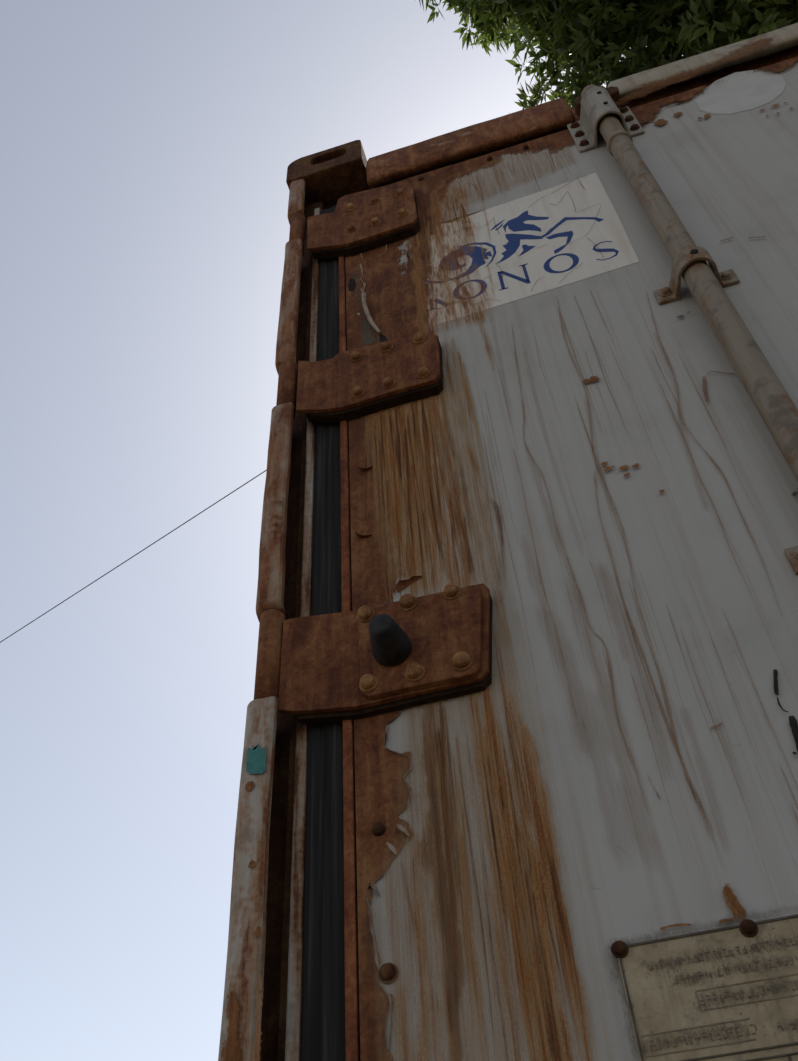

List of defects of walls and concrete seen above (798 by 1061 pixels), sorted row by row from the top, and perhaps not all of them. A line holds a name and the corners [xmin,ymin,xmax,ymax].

corrosion [614,37,773,105]
corrosion [396,164,492,356]
corrosion [601,461,639,477]
corrosion [365,346,590,1061]
peeling [354,710,413,1061]
corrosion [719,884,746,924]
corrosion [221,924,264,1061]